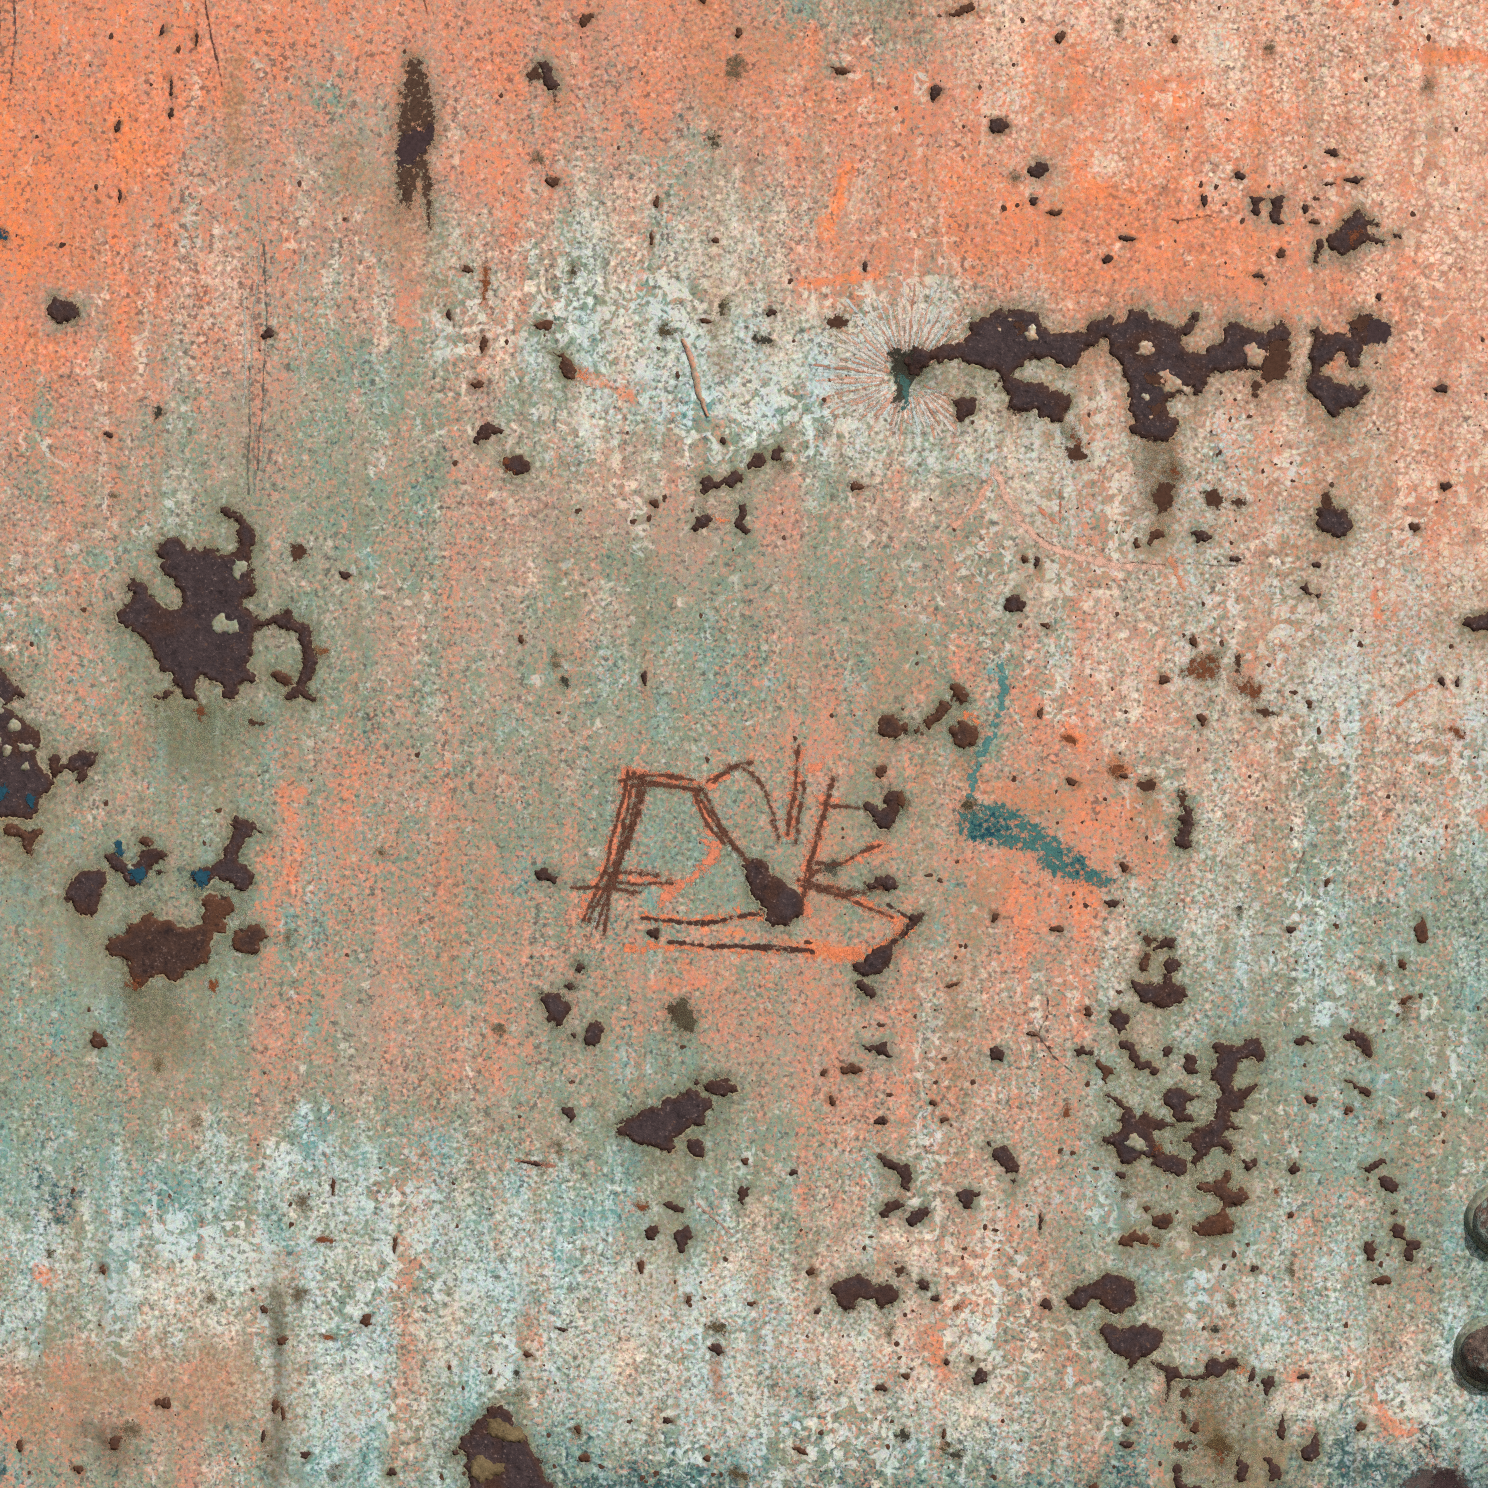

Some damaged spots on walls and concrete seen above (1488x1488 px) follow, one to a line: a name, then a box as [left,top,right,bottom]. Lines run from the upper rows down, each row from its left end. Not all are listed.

corrosion [1328,0,1450,106]
corrosion [392,49,442,229]
corrosion [752,309,796,344]
corrosion [825,314,864,329]
corrosion [904,171,1416,607]
corrosion [1004,594,1051,629]
corrosion [1272,915,1339,971]
corrosion [737,1157,750,1205]
corrosion [944,1355,988,1385]
corrosion [931,1428,964,1488]